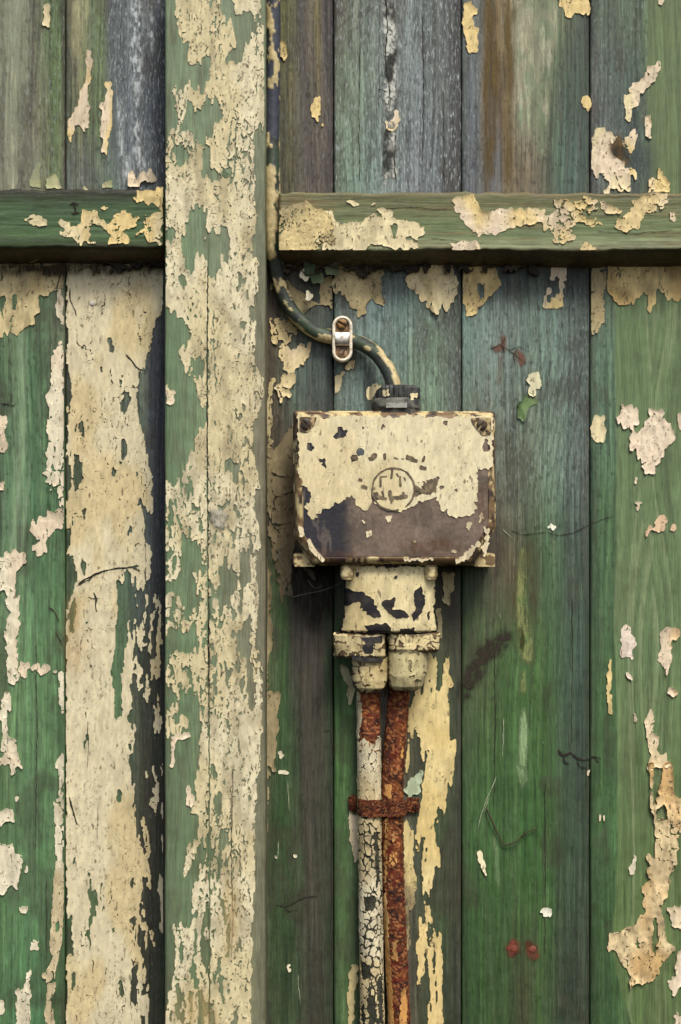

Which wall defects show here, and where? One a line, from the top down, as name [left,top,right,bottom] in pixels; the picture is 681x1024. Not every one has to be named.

peeling [450,61,676,250]
peeling [405,265,501,317]
peeling [543,267,567,309]
peeling [591,266,681,335]
peeling [590,404,681,484]
peeling [0,0,316,1024]
crack [79,566,139,611]
peeling [340,653,456,1024]
peeling [607,709,681,996]